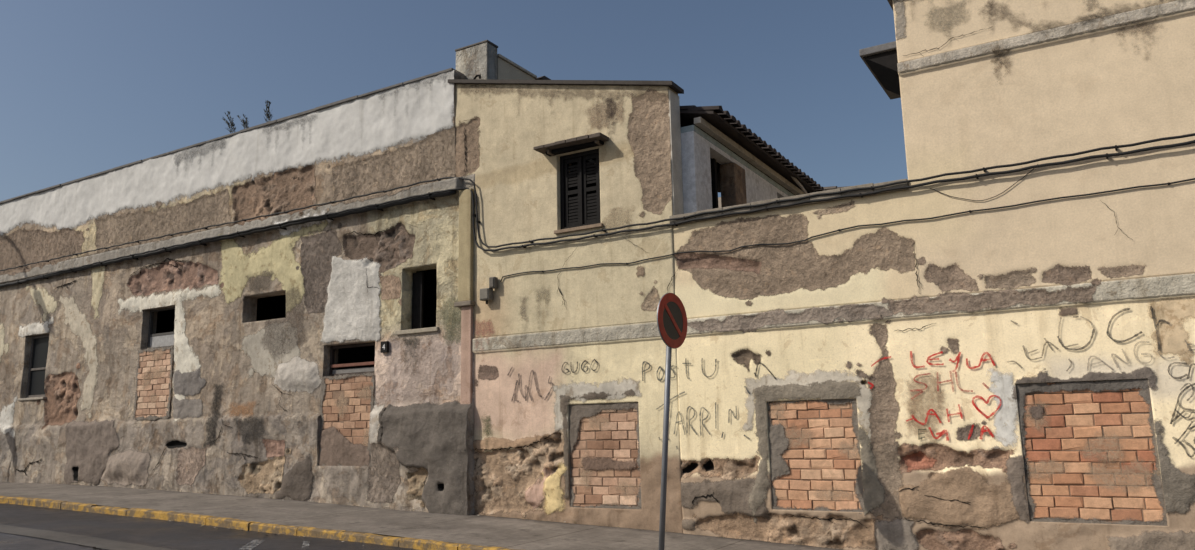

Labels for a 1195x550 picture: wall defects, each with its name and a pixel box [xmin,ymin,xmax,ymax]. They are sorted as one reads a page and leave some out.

crack [903,26,993,56]
spalling [627,88,672,218]
spalling [0,116,480,418]
peeling [0,396,18,439]
spalling [674,200,1146,520]
peeling [525,462,567,514]